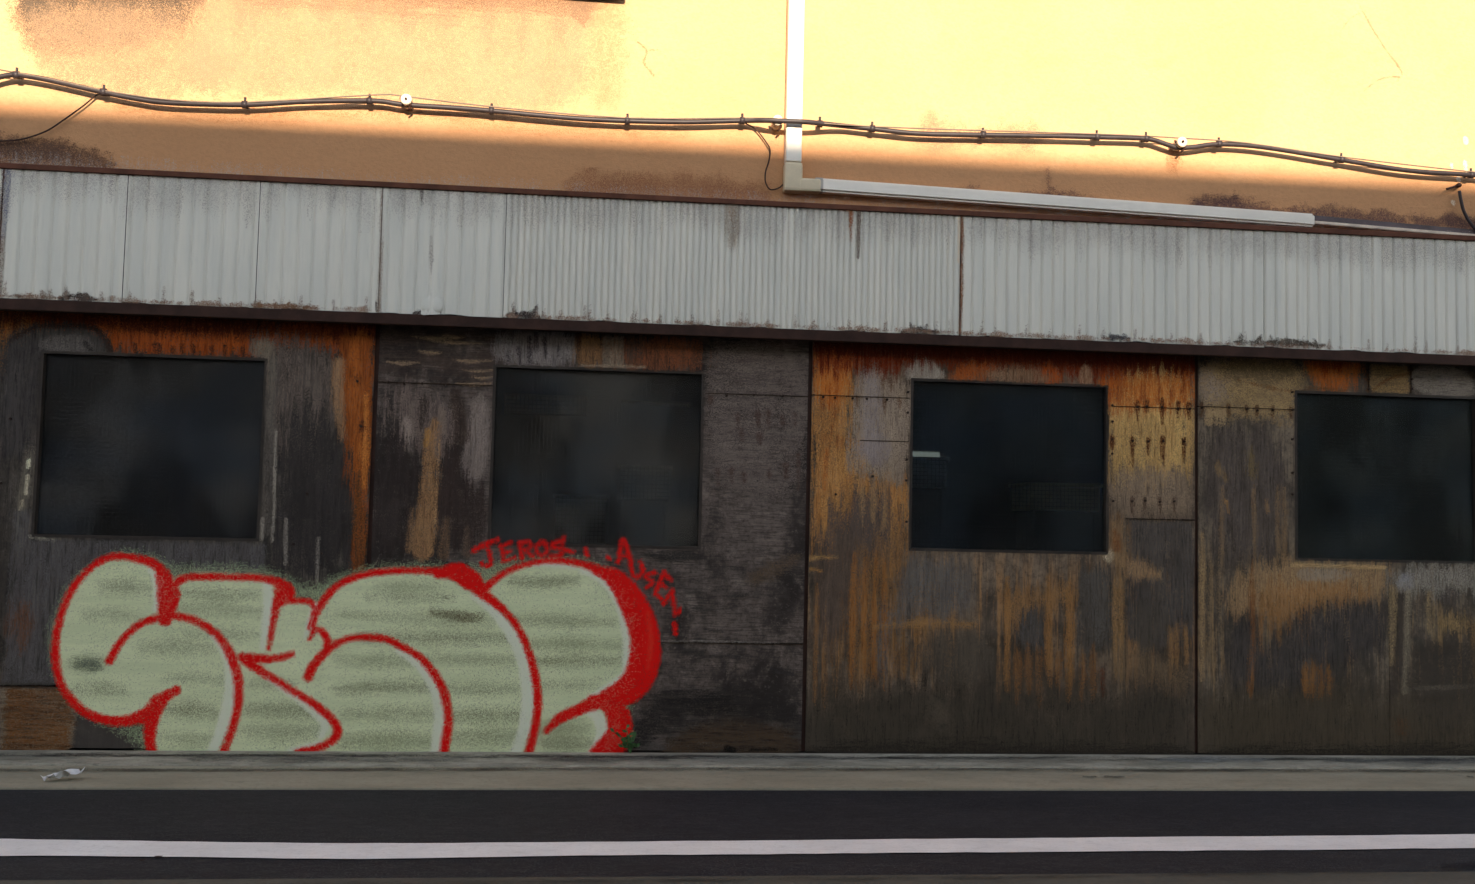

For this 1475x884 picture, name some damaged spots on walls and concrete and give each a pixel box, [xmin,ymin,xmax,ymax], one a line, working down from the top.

corrosion [0,169,384,598]
corrosion [504,210,1475,710]
damp [1186,189,1475,269]